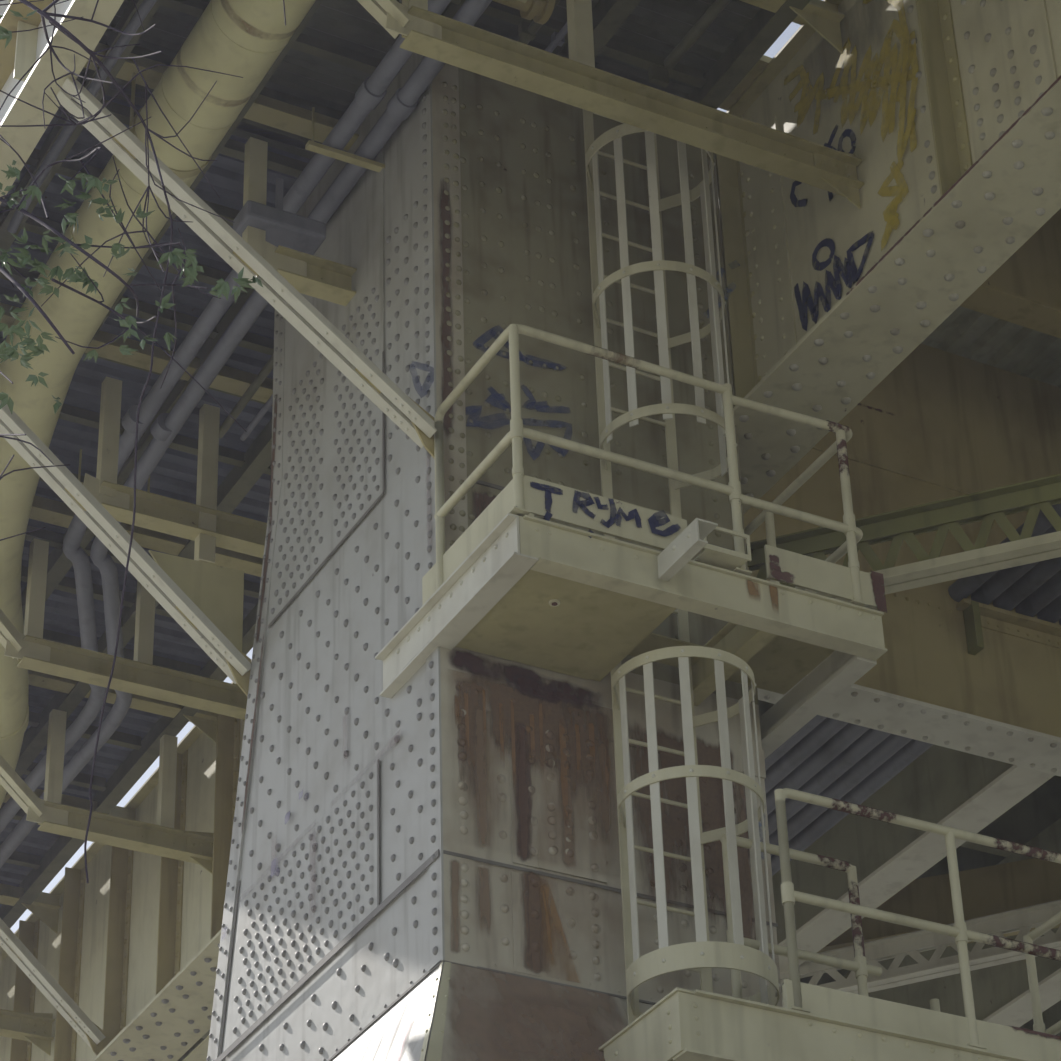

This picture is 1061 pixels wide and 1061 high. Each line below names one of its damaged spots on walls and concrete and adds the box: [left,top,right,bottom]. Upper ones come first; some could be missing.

rust [440,184,453,435]
rust [473,492,496,520]
rust [747,555,794,609]
rust [455,678,610,860]
rust [451,861,460,952]
rust [479,867,490,930]
rust [523,873,579,983]
rust [984,933,1061,961]
rust [1012,1026,1061,1040]